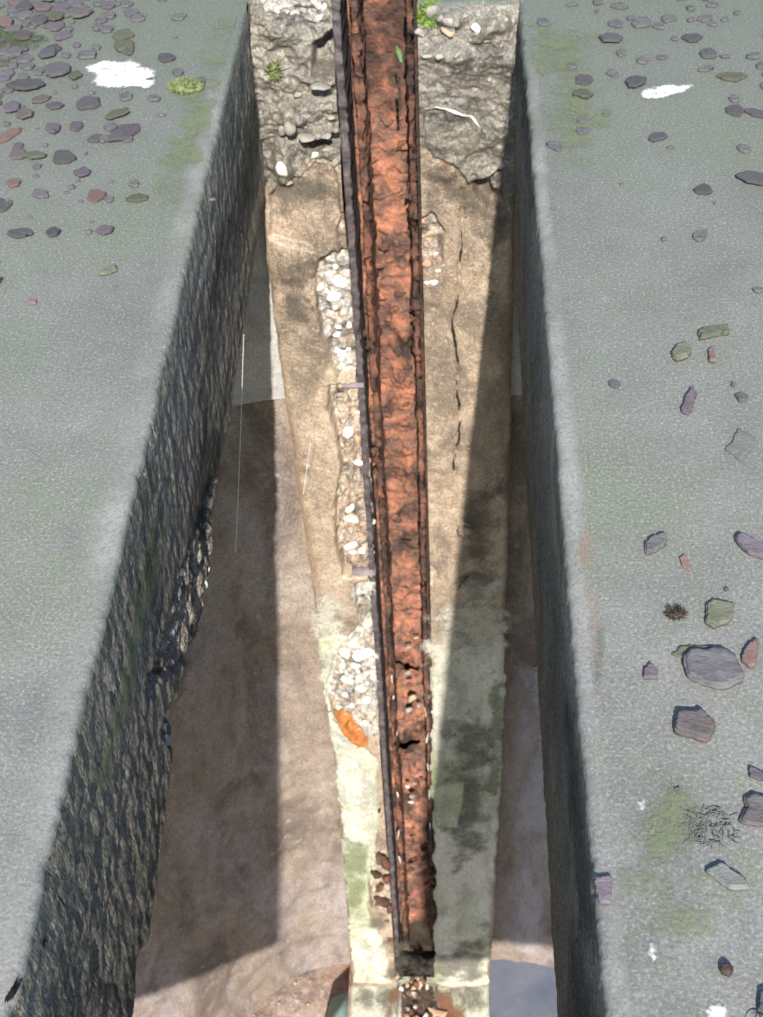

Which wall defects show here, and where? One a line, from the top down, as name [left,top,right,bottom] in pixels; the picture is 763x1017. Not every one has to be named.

spalling [414,0,513,60]
peeling [422,102,483,169]
crack [451,295,461,470]
spalling [152,516,213,675]
corrosion [334,709,368,748]
water stain [429,724,494,862]
water stain [357,925,489,1011]